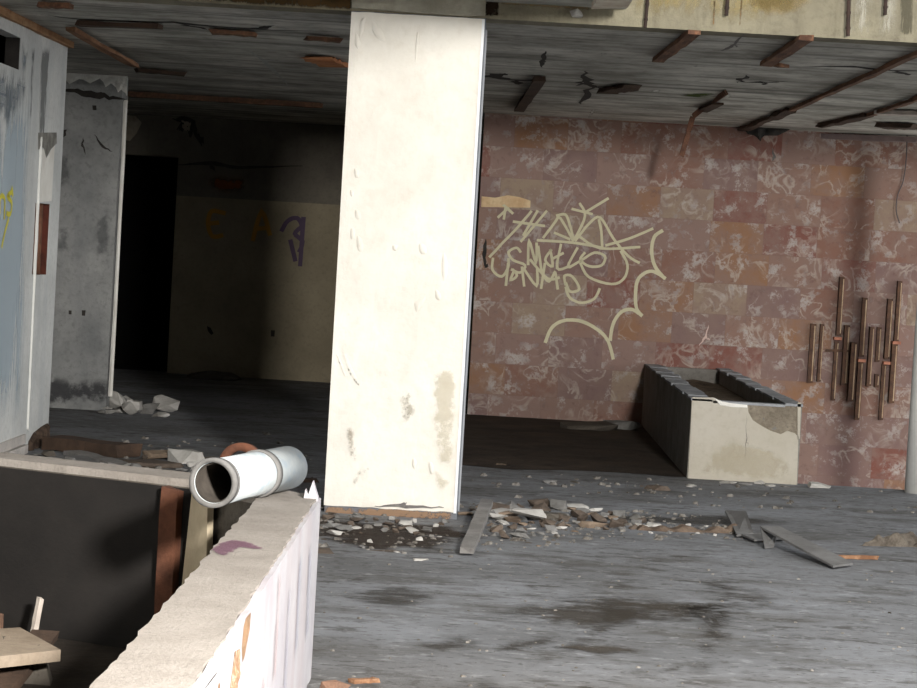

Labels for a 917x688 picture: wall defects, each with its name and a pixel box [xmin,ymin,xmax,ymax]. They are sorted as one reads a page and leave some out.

peeling [66,73,141,397]
spalling [715,398,797,435]